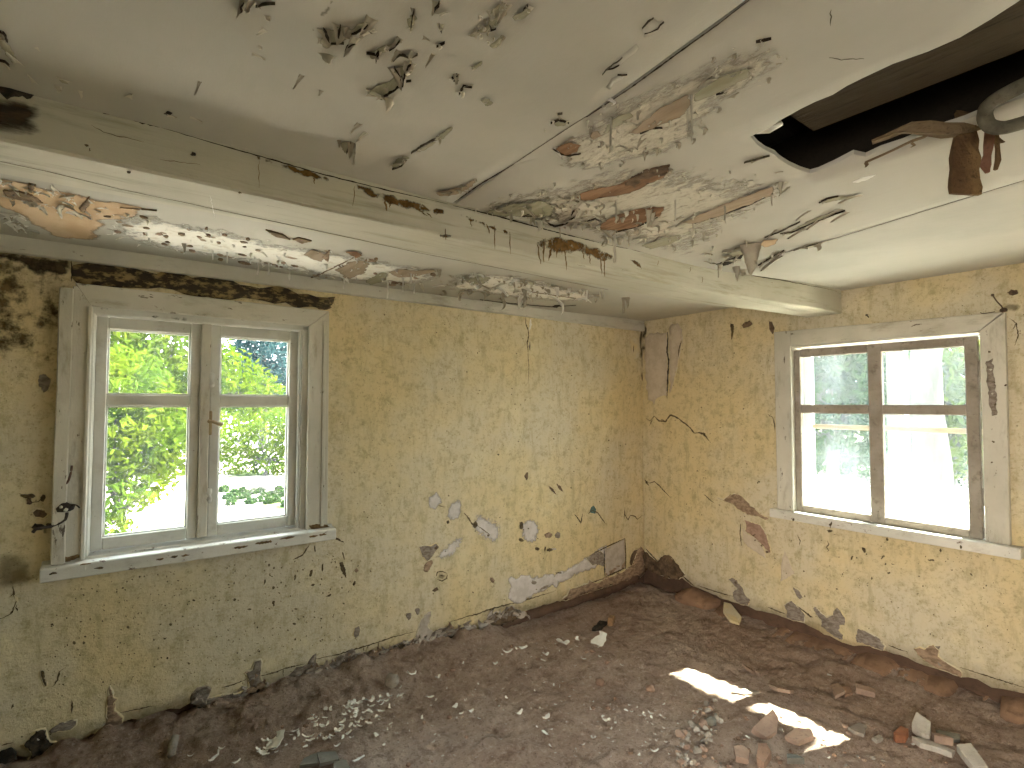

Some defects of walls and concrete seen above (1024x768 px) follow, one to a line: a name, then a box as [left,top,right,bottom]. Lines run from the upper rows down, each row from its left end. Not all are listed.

peeling [317,0,449,113]
peeling [475,37,875,281]
peeling [0,178,604,315]
damp [0,253,69,351]
crack [646,414,711,443]
peeling [985,351,1007,443]
spalling [293,524,359,586]
peeling [718,493,771,558]
peeling [288,538,685,677]
spalling [784,588,886,651]
spalling [913,644,962,678]
spalling [0,719,77,764]